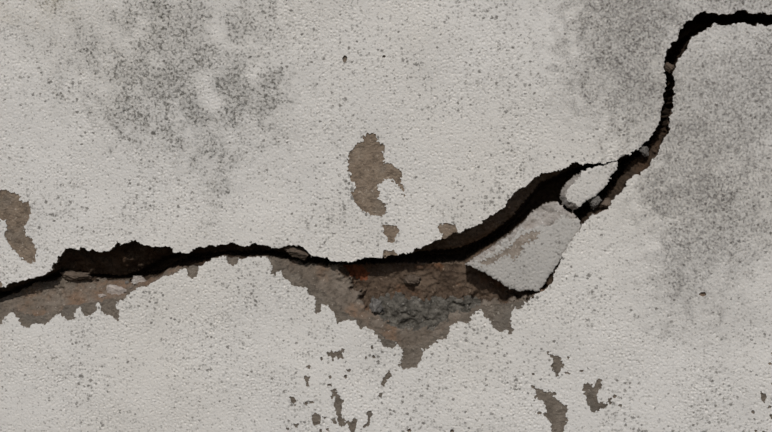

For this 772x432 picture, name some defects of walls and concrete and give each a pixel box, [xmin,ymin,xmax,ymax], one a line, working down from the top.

crack [0,12,772,299]
peeling [0,189,38,264]
spalling [268,133,549,369]
spalling [0,265,199,328]
peeling [312,375,373,432]
peeling [531,385,568,432]
peeling [547,351,583,378]
peeling [582,378,622,412]